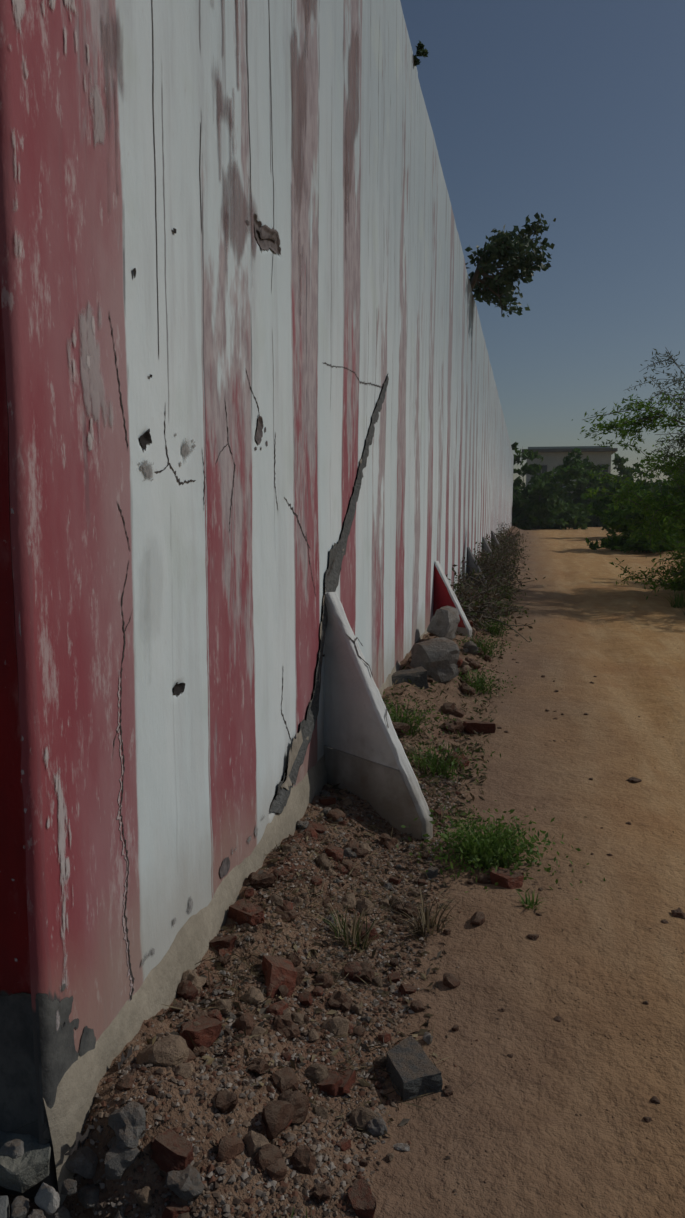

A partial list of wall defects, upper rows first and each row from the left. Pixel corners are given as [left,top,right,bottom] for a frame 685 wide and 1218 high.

peeling [12,0,26,33]
peeling [42,0,106,144]
spalling [245,214,281,255]
spalling [255,415,268,450]
crack [156,362,389,814]
crack [113,502,135,1001]
flaking render [0,747,96,1142]